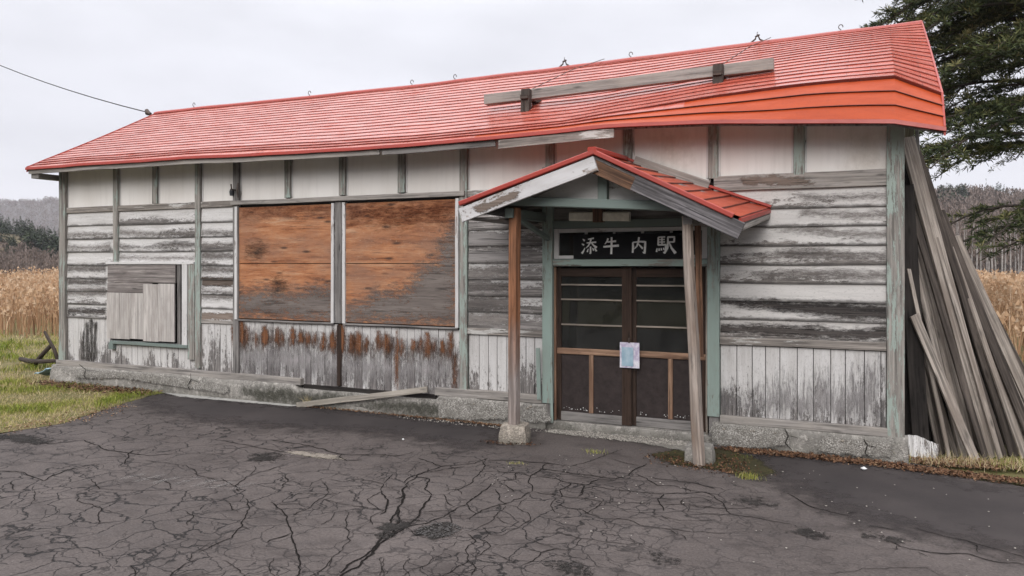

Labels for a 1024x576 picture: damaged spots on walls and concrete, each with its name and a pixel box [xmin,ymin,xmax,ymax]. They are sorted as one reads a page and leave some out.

peeling [471,191,520,213]
peeling [740,174,886,238]
leakage [239,202,460,367]
peeling [747,248,886,280]
peeling [721,297,886,341]
corrosion [231,320,457,390]
crack [8,438,176,523]
crack [170,440,849,576]
crack [836,528,1024,573]